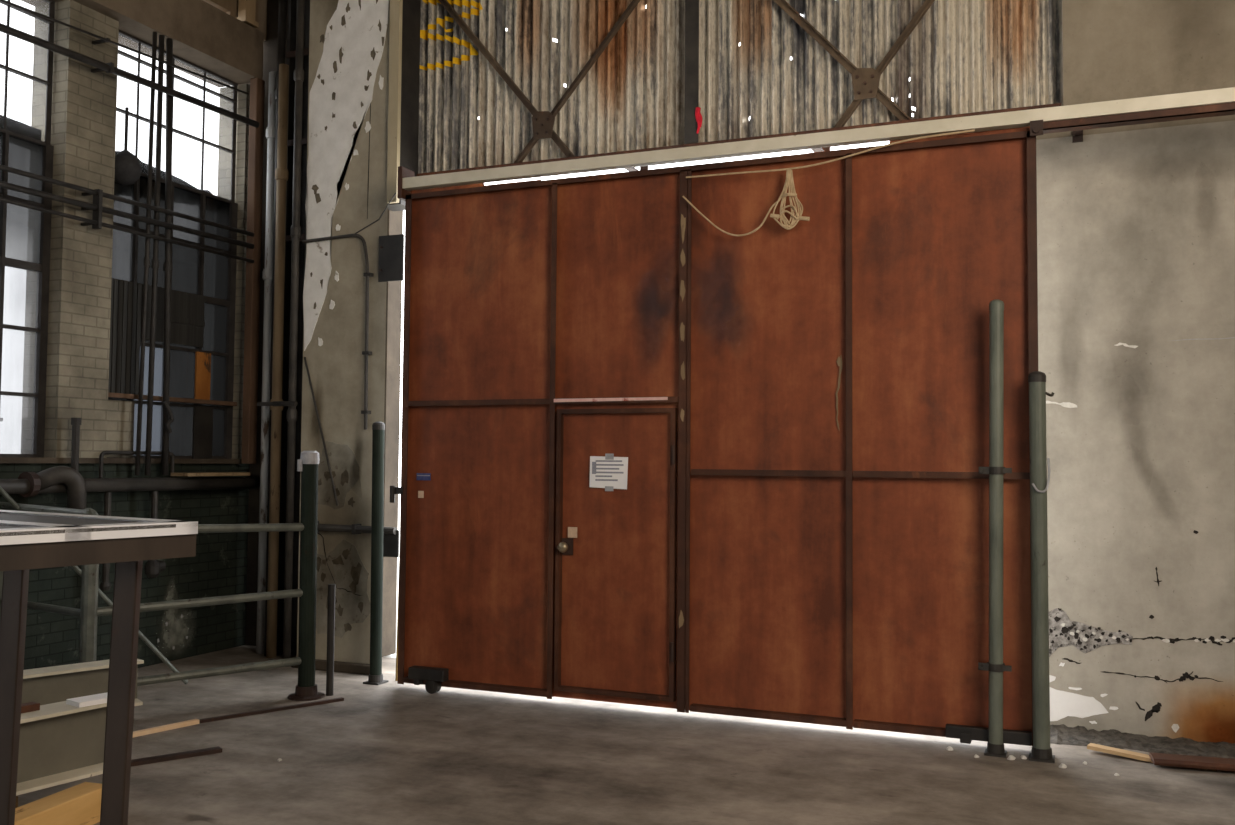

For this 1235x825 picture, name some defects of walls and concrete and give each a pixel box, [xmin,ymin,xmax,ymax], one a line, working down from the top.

spalling [1049,608,1133,724]
spalling [1135,701,1162,721]